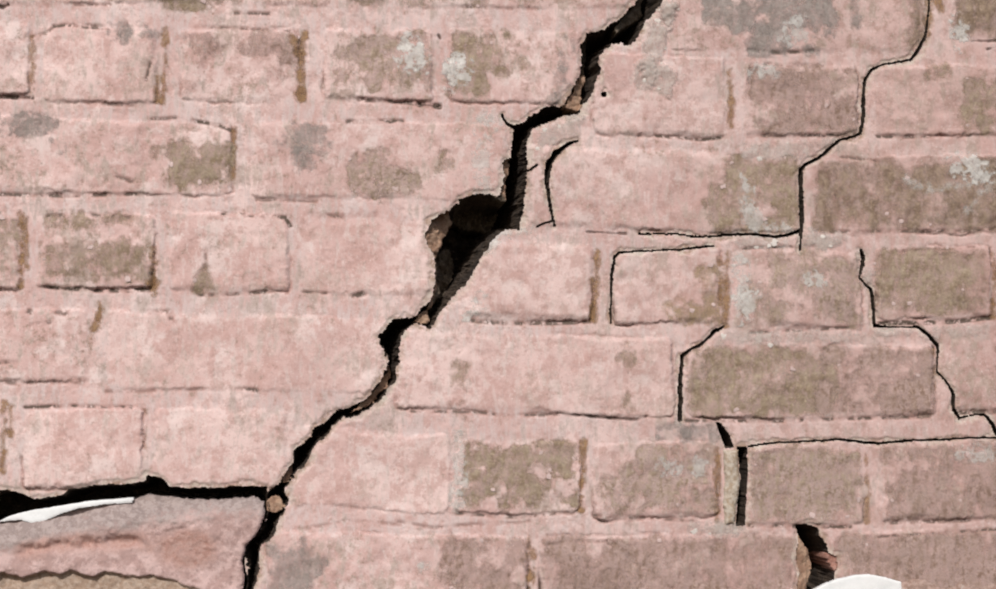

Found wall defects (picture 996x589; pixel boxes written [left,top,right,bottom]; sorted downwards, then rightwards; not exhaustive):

crack [0,0,663,589]
crack [677,325,725,422]
crack [589,0,930,324]
crack [716,249,996,526]